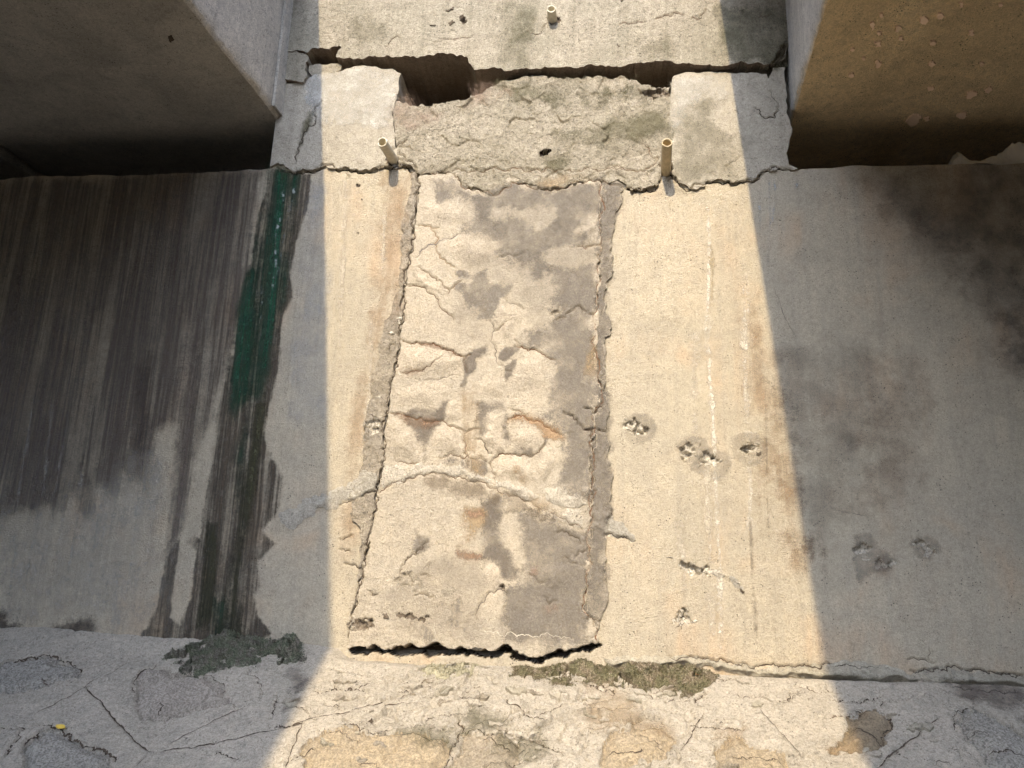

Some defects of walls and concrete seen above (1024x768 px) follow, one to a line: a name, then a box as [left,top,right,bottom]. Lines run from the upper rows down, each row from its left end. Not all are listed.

spalling [638,88,669,100]
damp [435,176,605,499]
crack [289,106,791,664]
damp [0,170,310,641]
spalling [679,439,723,468]
spalling [740,440,761,456]
damp [481,496,590,645]
spalling [670,556,745,594]
spalling [352,613,430,631]
crack [670,656,873,672]
crack [910,650,1023,678]
crack [1,724,117,762]